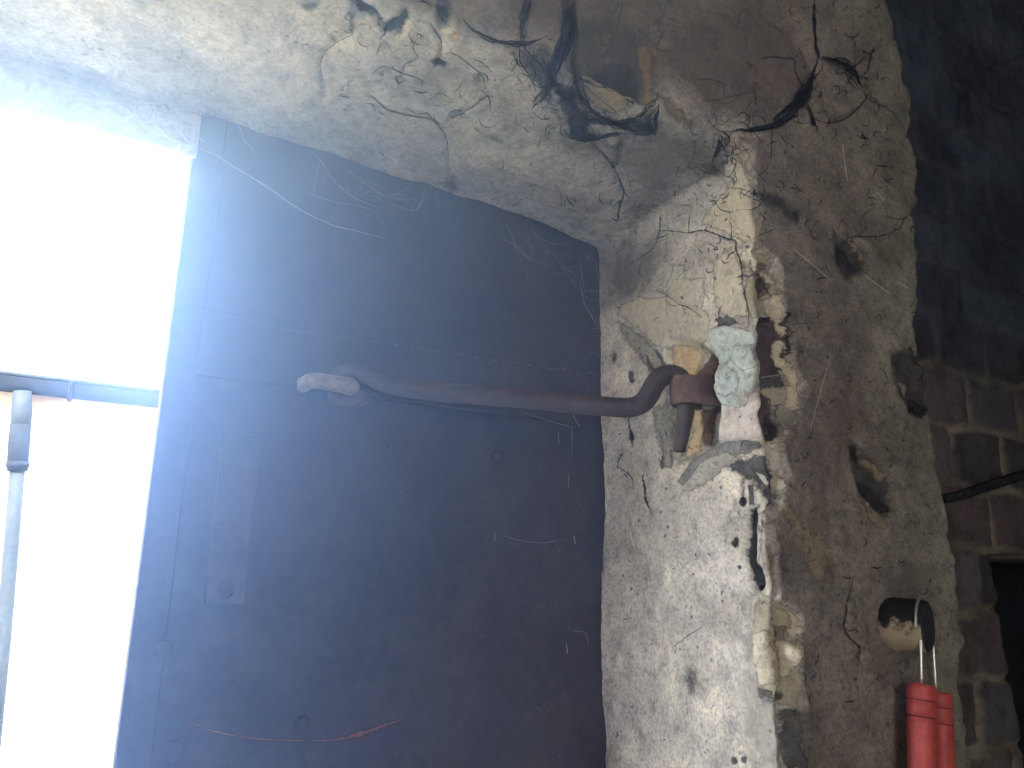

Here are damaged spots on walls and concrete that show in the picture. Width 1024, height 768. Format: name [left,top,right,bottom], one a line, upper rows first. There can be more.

crack [385,24,442,81]
crack [369,94,493,172]
crack [813,74,904,128]
crack [595,142,630,221]
crack [631,212,772,322]
spalling [835,240,864,278]
corrosion [672,344,719,377]
peeling [618,144,805,566]
spalling [891,347,927,418]
corrosion [683,405,721,460]
spalling [849,445,889,530]
spalling [741,592,807,768]